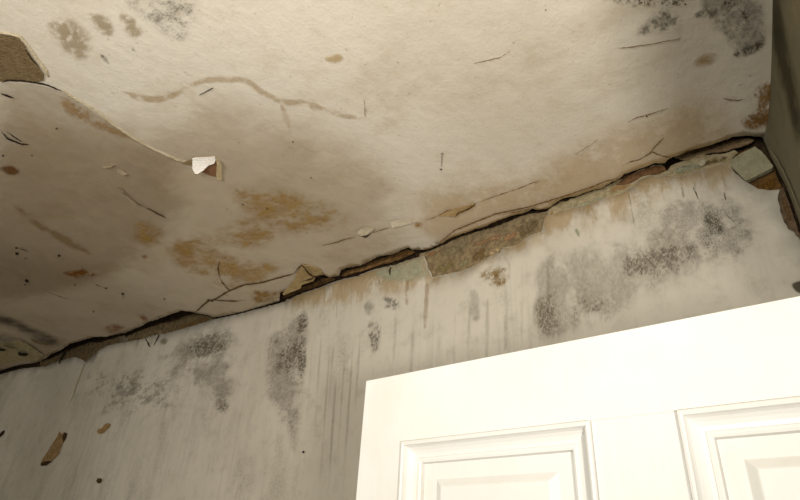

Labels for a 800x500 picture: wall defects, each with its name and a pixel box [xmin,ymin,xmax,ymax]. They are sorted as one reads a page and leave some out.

spalling [0,31,49,82]
rust [745,84,771,129]
crack [3,131,29,145]
peeling [62,89,222,181]
flaking render [419,147,800,277]
crack [0,136,800,402]
spalling [40,431,67,466]